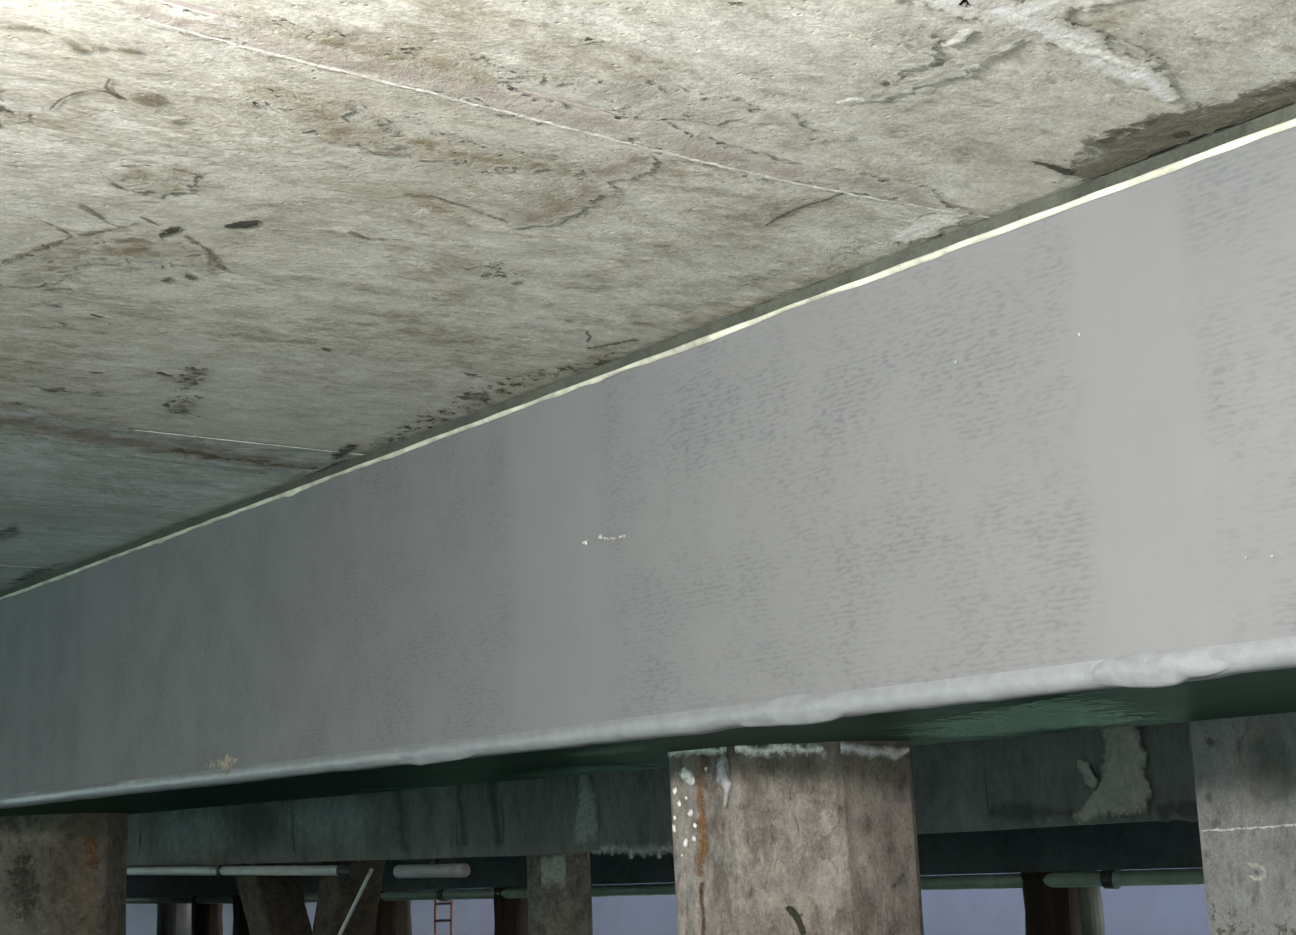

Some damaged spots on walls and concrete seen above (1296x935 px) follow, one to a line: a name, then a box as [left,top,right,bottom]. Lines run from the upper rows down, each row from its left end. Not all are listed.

damp [836,0,1180,104]
spalling [1033,72,1296,183]
crack [765,193,843,226]